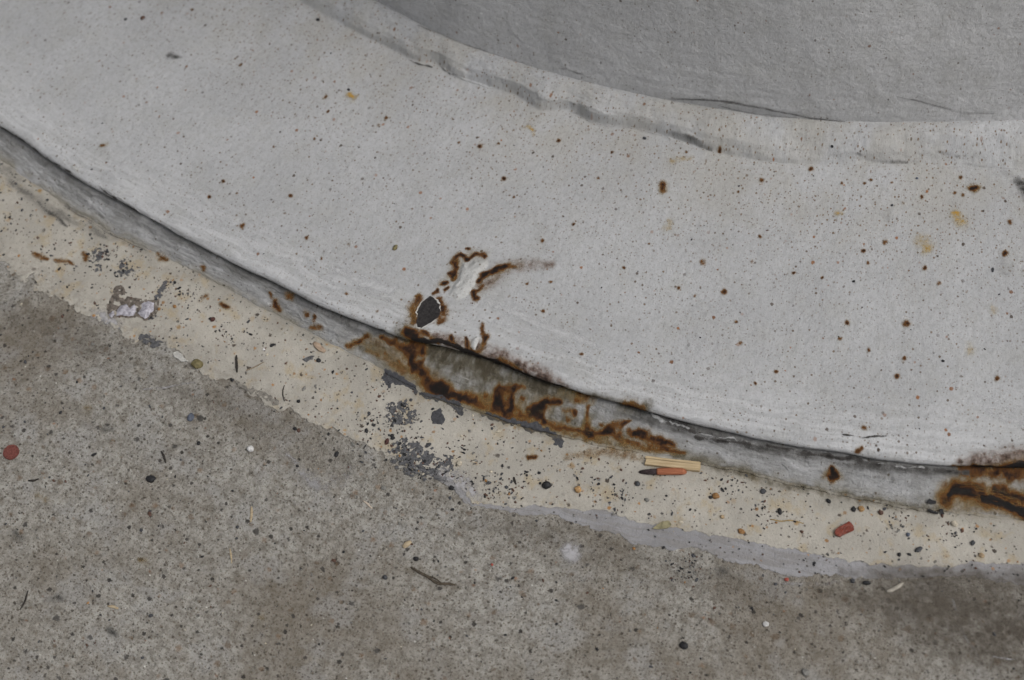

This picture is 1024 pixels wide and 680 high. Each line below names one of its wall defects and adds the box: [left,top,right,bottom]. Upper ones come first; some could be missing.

spalling [107,260,167,321]
peeling [409,295,448,329]
corrosion [415,247,517,302]
peeling [382,368,464,427]
corrosion [345,322,686,458]
peeling [386,438,457,483]
corrosion [823,465,840,483]
corrosion [936,450,1024,520]